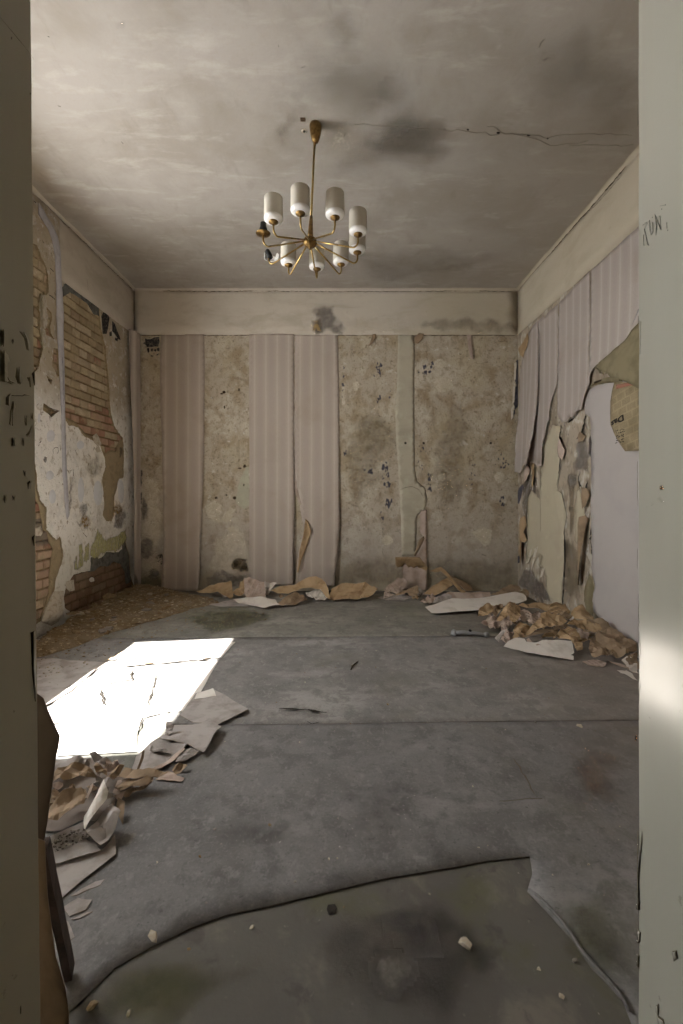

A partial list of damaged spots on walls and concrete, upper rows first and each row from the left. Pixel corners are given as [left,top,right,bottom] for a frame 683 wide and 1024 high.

crack [356,104,638,292]
spalling [0,244,124,521]
peeling [144,337,160,356]
leakage [313,309,342,333]
crack [280,287,443,295]
peeling [364,461,392,520]
peeling [518,309,639,658]
spalling [23,457,132,702]
spalling [205,494,249,580]